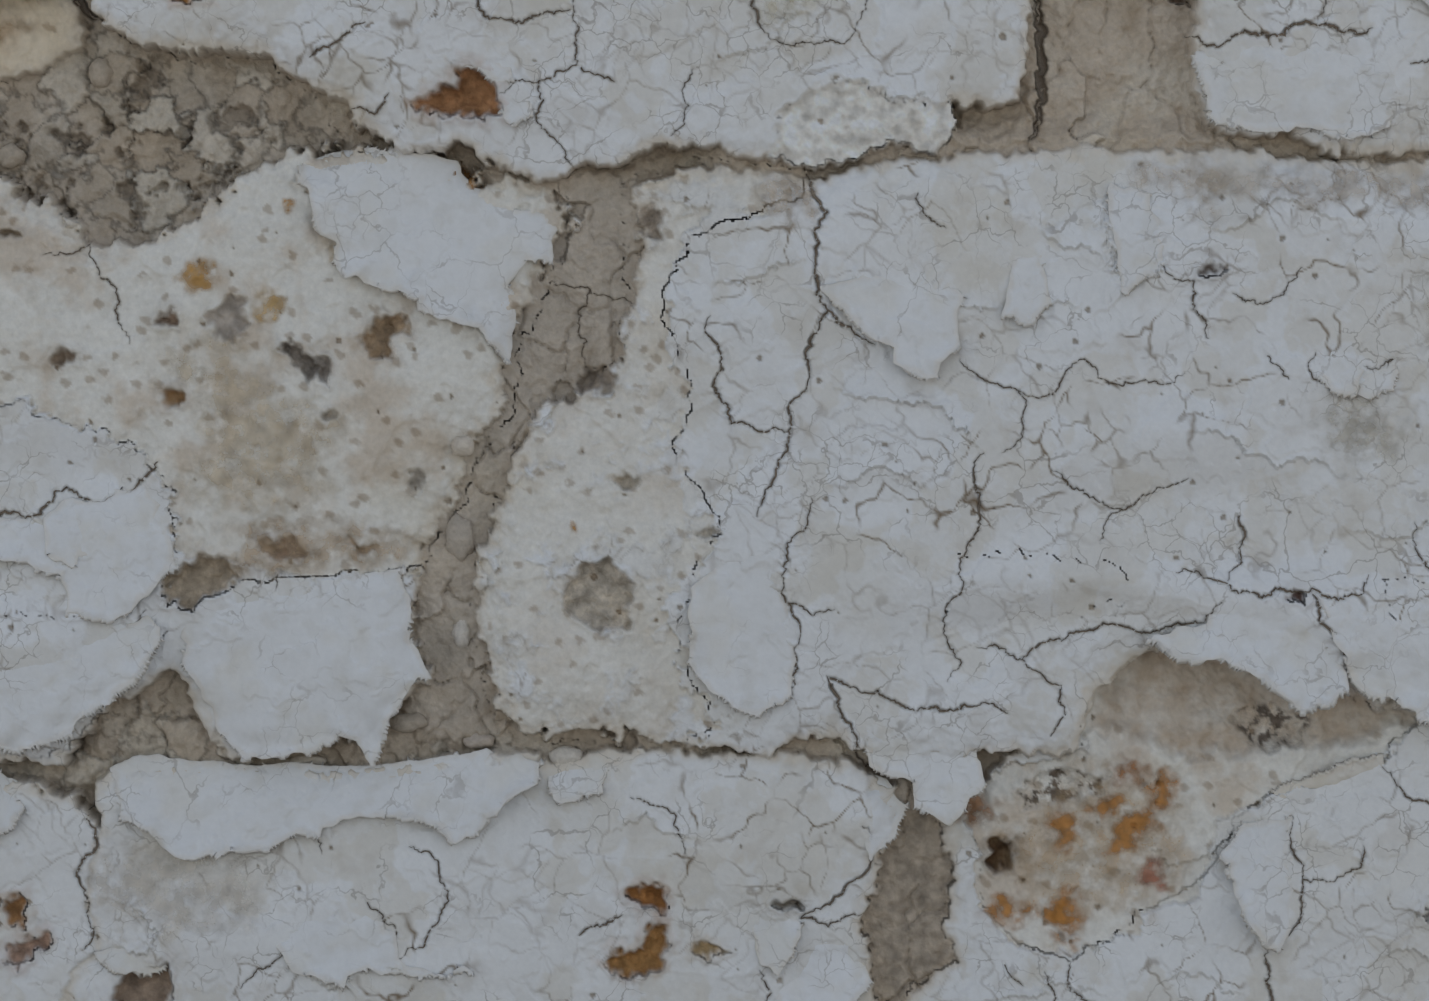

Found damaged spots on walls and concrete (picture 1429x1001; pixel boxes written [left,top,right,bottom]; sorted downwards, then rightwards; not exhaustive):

crack [477,0,614,165]
crack [1029,0,1048,139]
crack [1184,3,1370,48]
crack [704,166,875,513]
peeling [0,18,966,862]
crack [781,359,1369,767]
crack [800,827,873,927]
corrosion [966,795,992,823]
corrosion [987,894,1080,936]
spalling [752,589,1429,1001]
corrosion [1050,769,1178,852]
corrosion [1142,860,1166,889]